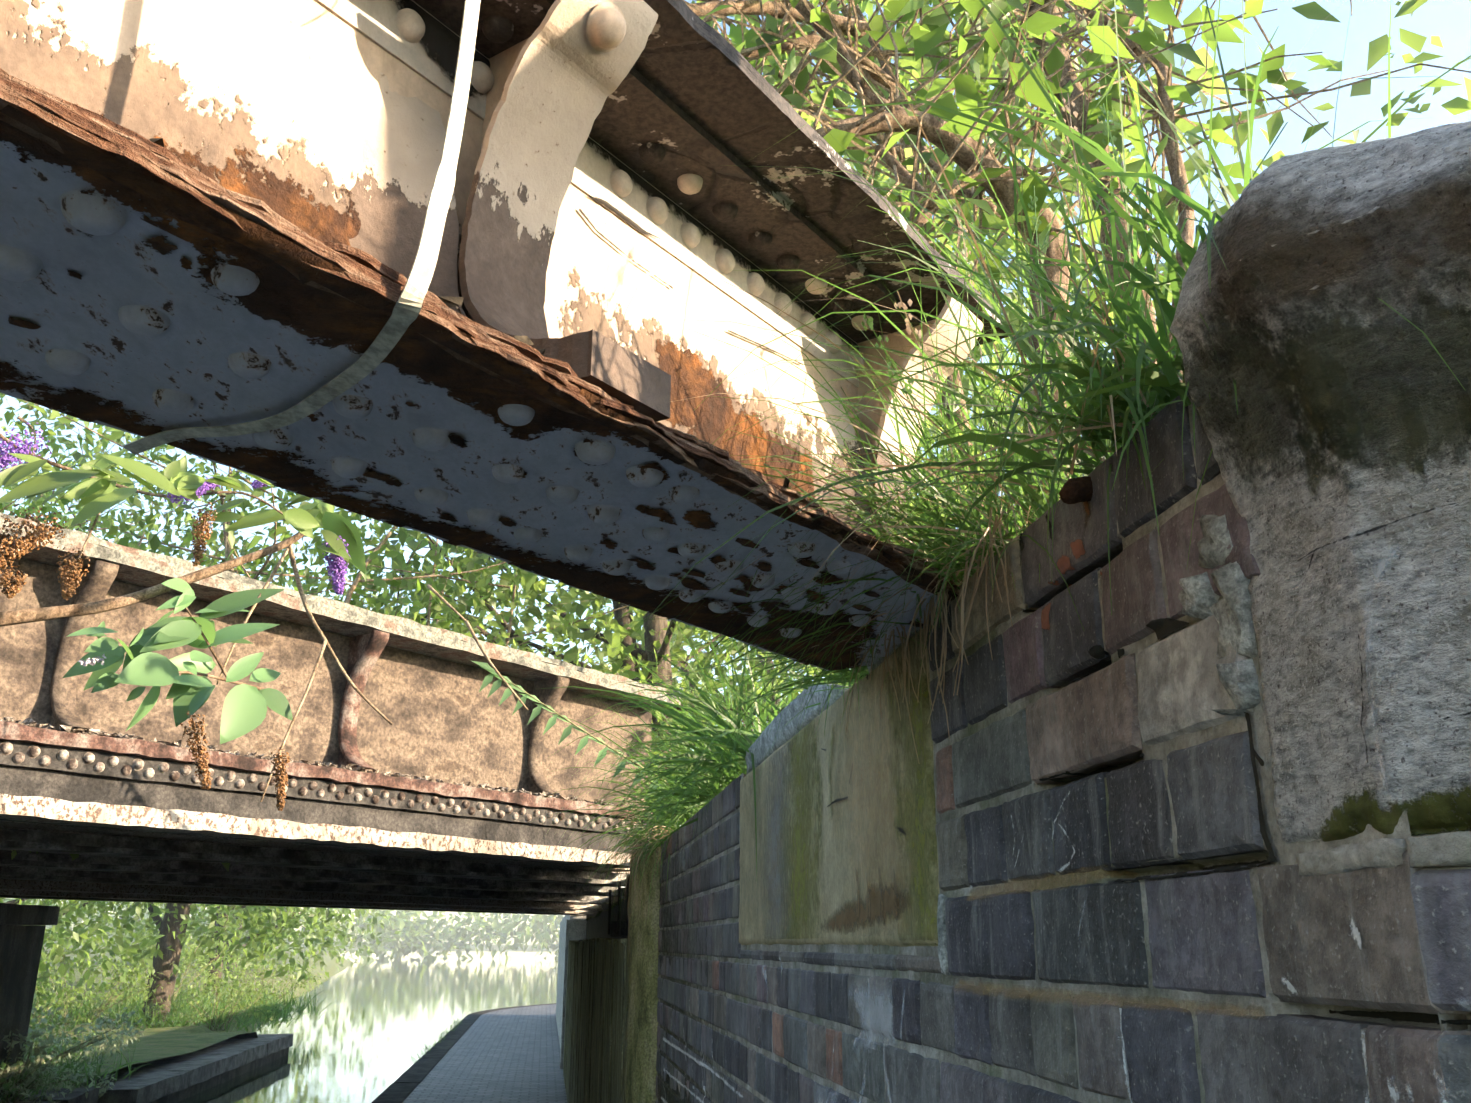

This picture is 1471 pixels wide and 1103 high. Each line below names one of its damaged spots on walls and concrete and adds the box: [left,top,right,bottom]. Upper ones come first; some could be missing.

peeling [0,0,355,220]
corrosion [0,68,407,354]
peeling [457,224,468,318]
water stain [1203,171,1471,335]
corrosion [0,360,883,671]
corrosion [380,290,963,601]
crack [1296,498,1471,569]
water stain [822,868,909,932]